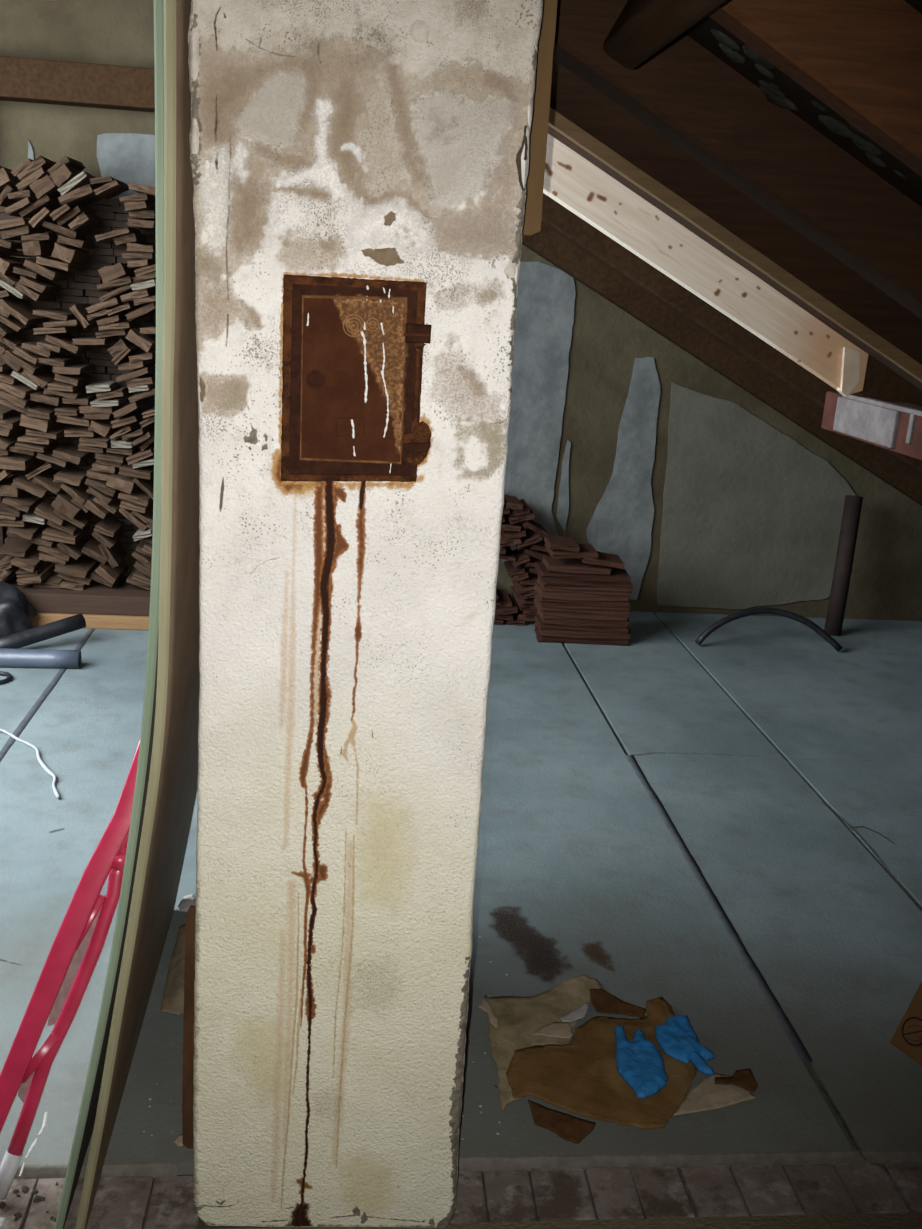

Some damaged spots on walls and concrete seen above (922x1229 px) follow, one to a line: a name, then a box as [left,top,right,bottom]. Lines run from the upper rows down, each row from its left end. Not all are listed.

leakage [189,37,530,350]
flaking render [360,244,404,266]
flaking render [384,210,396,226]
leakage [200,374,247,417]
leakage [437,356,504,477]
rust [271,272,432,1227]